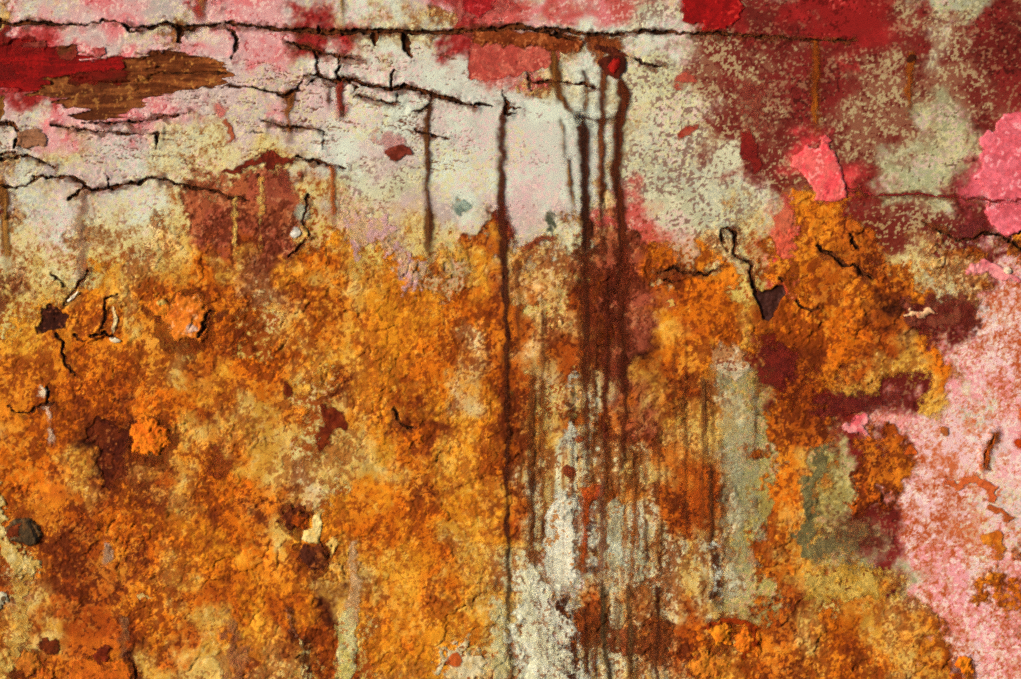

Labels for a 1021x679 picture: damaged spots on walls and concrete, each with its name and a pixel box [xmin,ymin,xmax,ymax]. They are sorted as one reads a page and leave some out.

peeling [0,32,235,121]
crack [0,16,856,140]
crack [50,108,190,149]
crack [0,119,249,201]
crack [250,119,346,169]
peeling [790,135,847,202]
crack [656,226,820,312]
peeling [772,208,798,259]
rust [844,421,917,521]
rust [943,473,1021,620]
rust [688,617,761,679]
rust [947,656,977,679]